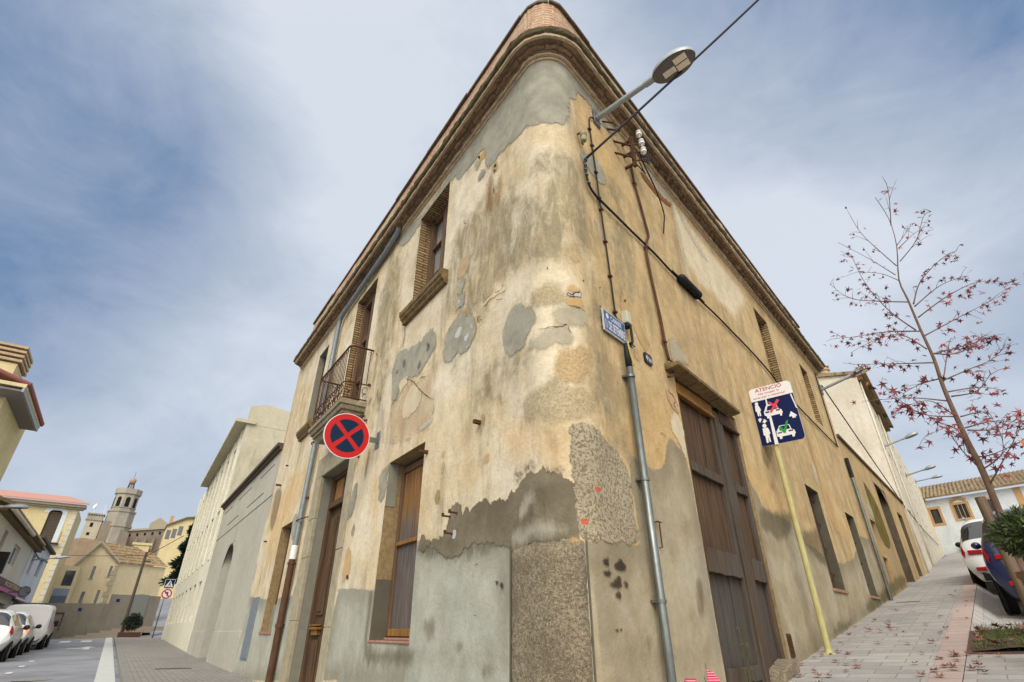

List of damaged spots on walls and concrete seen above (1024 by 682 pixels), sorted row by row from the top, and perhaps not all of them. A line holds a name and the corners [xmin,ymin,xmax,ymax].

peeling [475,150,496,181]
flaking render [418,283,639,559]
water stain [603,558,628,599]